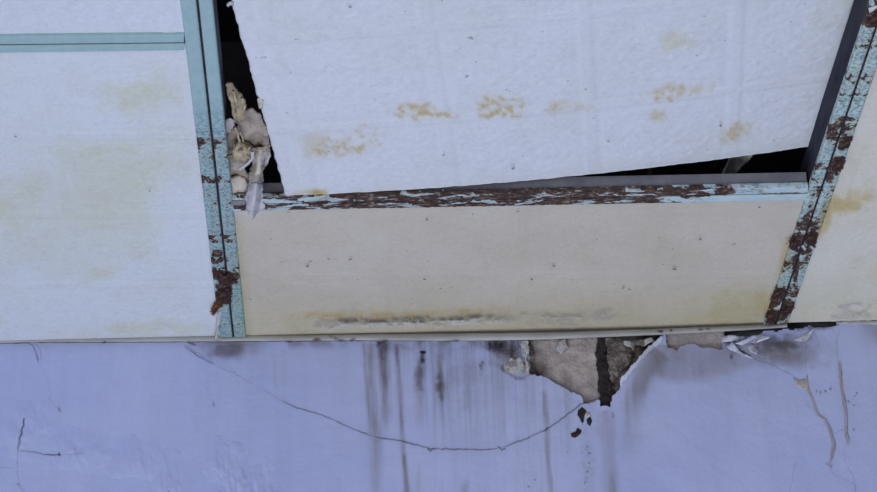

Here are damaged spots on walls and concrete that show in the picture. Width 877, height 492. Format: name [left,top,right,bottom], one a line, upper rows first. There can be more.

rust [831,136,853,176]
rust [787,232,818,252]
rust [210,257,238,316]
rust [764,287,795,324]
spalling [502,331,770,438]
crack [794,375,809,390]